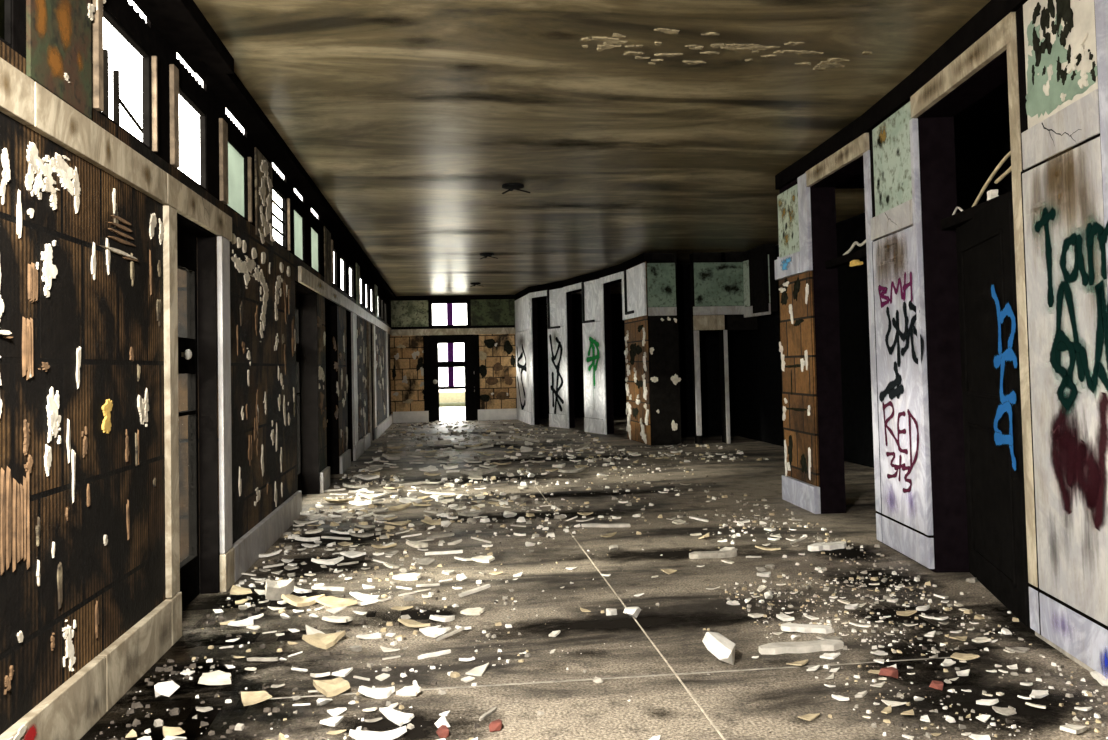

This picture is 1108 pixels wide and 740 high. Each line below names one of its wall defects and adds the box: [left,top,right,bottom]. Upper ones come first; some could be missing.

peeling [1026,0,1097,118]
peeling [0,142,81,238]
peeling [0,267,13,339]
peeling [36,240,58,297]
peeling [91,213,164,327]
peeling [23,386,90,521]
peeling [101,399,113,434]
peeling [125,347,149,466]
peeling [231,250,296,507]
peeling [624,328,659,444]
peeling [35,517,77,671]